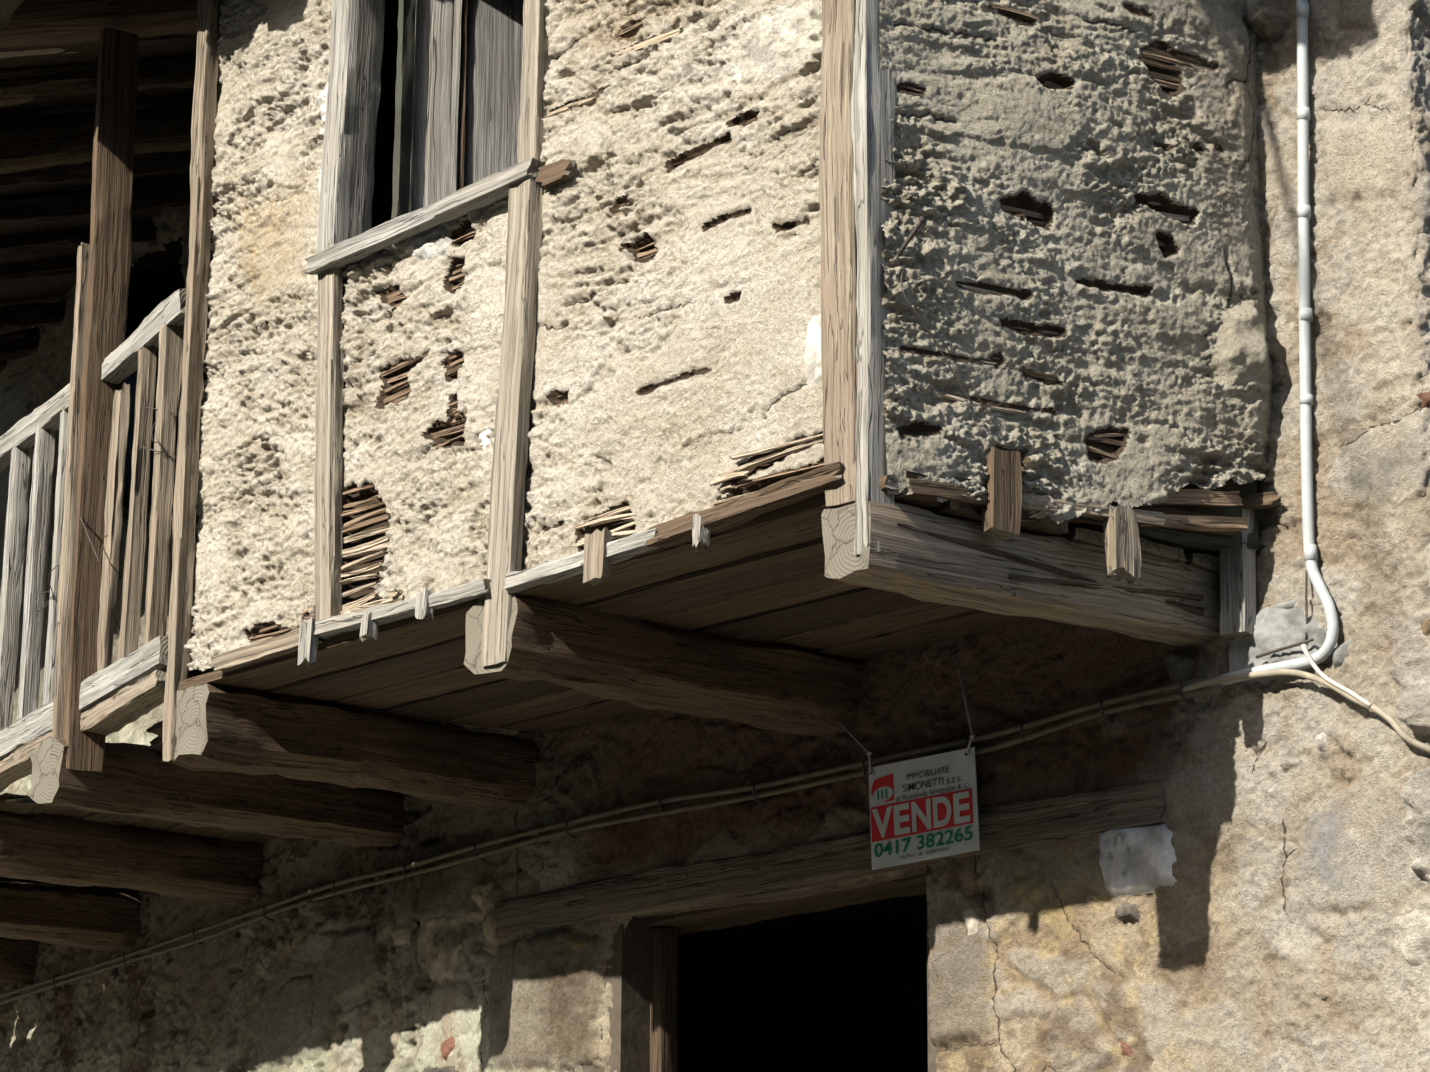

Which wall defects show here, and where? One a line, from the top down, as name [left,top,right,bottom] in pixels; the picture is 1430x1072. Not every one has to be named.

flaking render [1123,3,1156,20]
flaking render [1138,40,1219,95]
flaking render [1000,191,1055,230]
flaking render [375,350,467,450]
flaking render [709,431,824,506]
flaking render [1085,426,1131,463]
flaking render [340,481,405,614]
flaking render [542,502,636,552]
crack [938,855,1060,1072]